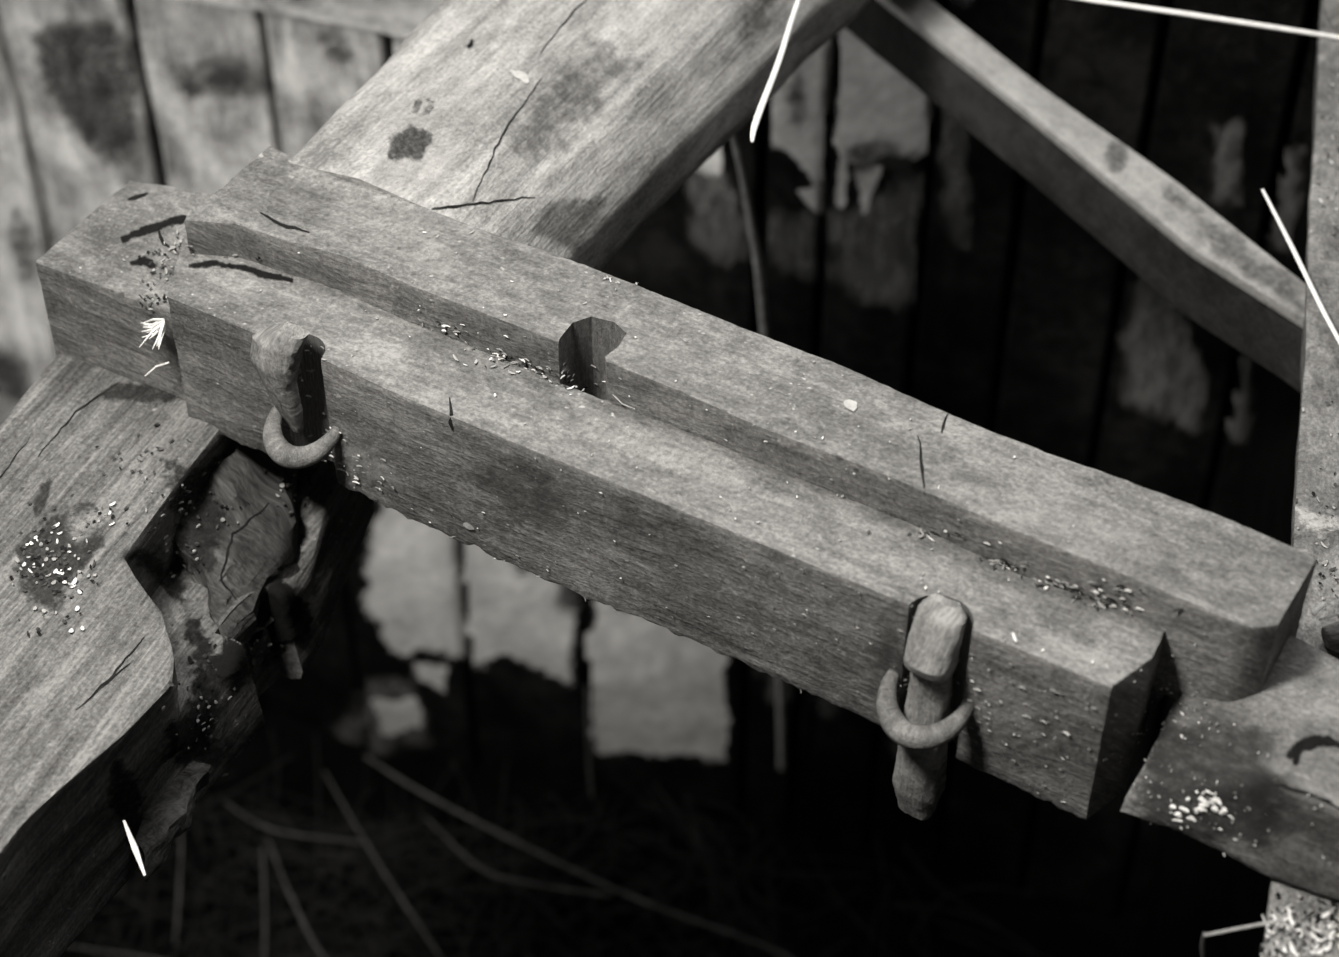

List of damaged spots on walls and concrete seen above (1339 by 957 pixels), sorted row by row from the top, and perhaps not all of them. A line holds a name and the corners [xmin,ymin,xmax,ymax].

crack [431,0,586,210]